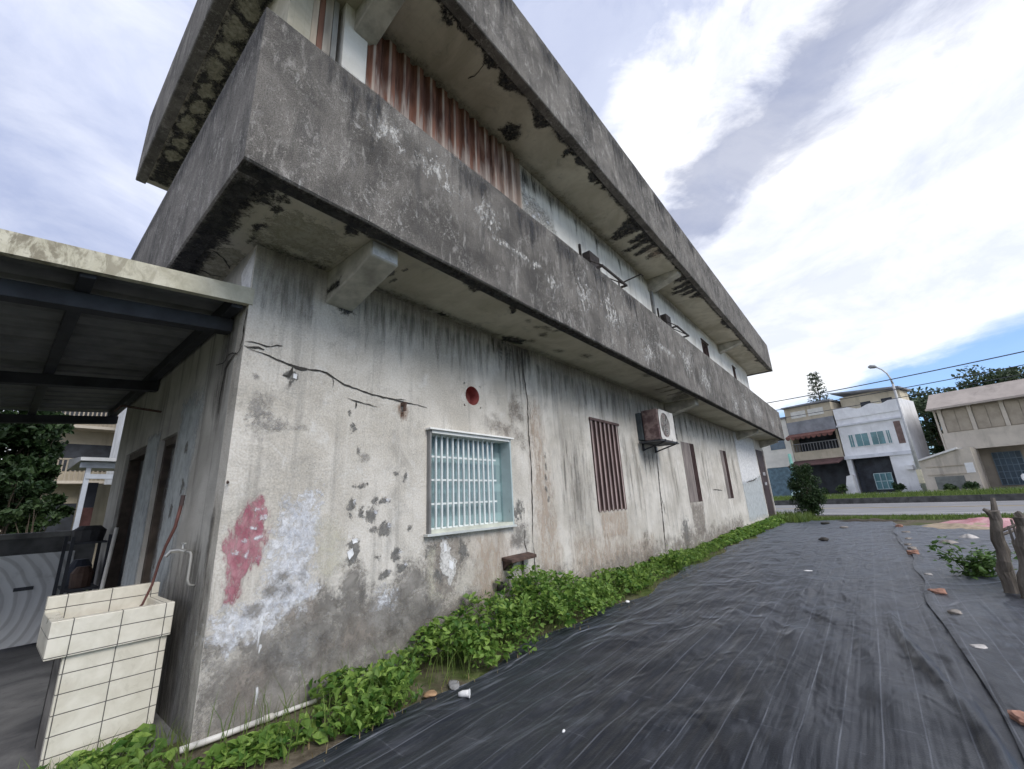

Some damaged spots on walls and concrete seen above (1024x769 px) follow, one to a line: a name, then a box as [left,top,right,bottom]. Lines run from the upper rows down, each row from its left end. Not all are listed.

mould [132,0,272,260]
crack [218,311,427,414]
leakage [171,151,783,441]
peeling [205,490,323,660]
leakage [155,516,516,740]
flaking render [346,538,360,566]
spalling [346,483,391,536]
spalling [374,547,407,580]
crack [521,349,536,585]
leakage [532,425,743,598]